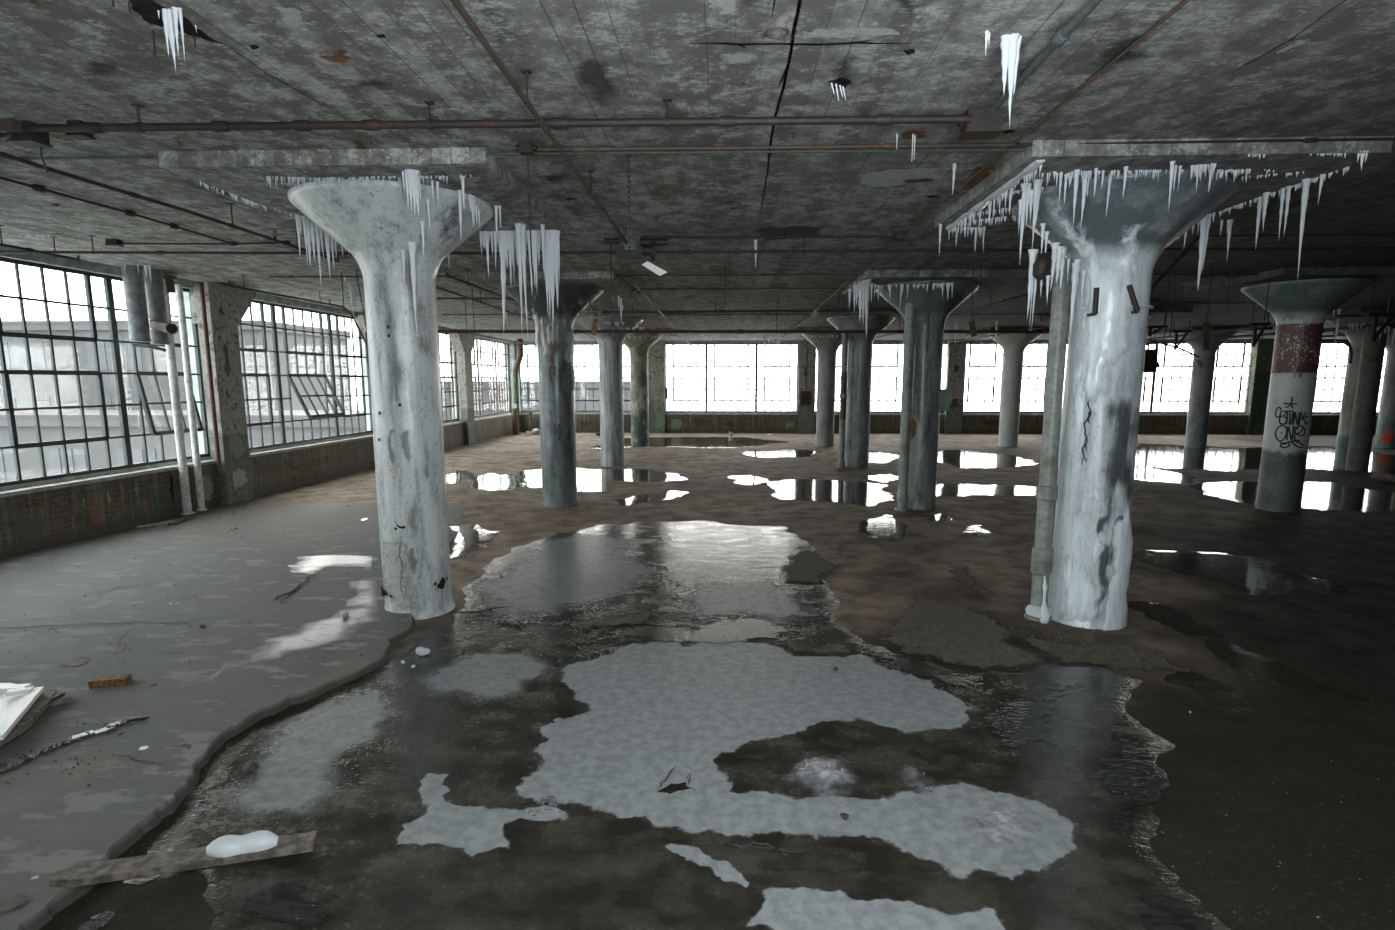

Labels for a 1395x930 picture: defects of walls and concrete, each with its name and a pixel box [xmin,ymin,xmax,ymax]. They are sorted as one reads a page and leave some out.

spalling [112,0,222,58]